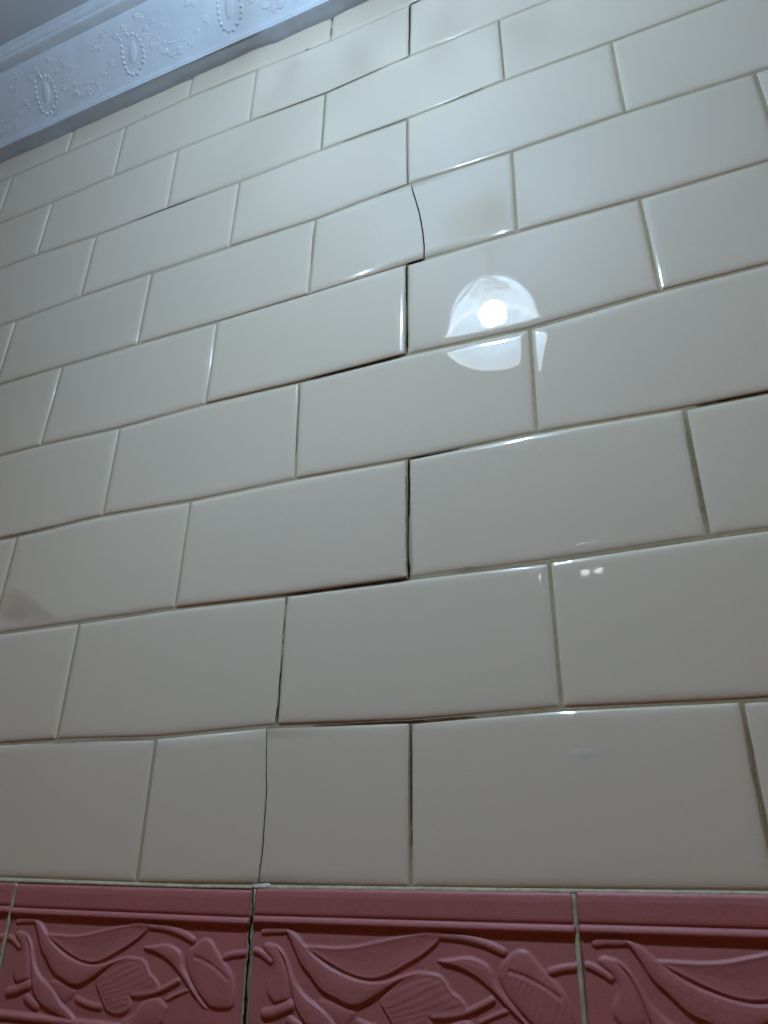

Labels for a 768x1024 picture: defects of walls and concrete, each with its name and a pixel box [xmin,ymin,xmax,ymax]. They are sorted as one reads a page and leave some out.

crack [261,0,425,456]
crack [243,449,469,1024]